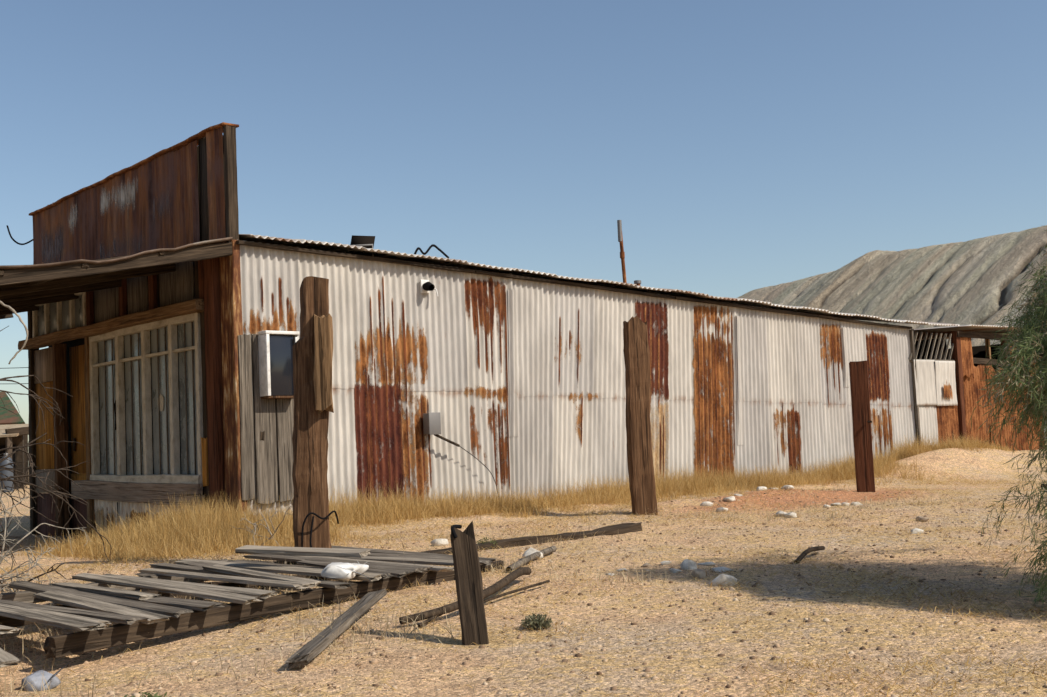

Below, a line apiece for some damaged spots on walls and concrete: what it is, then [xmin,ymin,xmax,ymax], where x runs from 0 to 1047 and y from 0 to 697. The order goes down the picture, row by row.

corrosion [32,127,226,265]
corrosion [354,278,432,507]
corrosion [464,277,510,492]
corrosion [635,299,669,482]
corrosion [692,306,735,478]
corrosion [773,405,802,474]
corrosion [820,324,843,402]
corrosion [866,331,893,458]